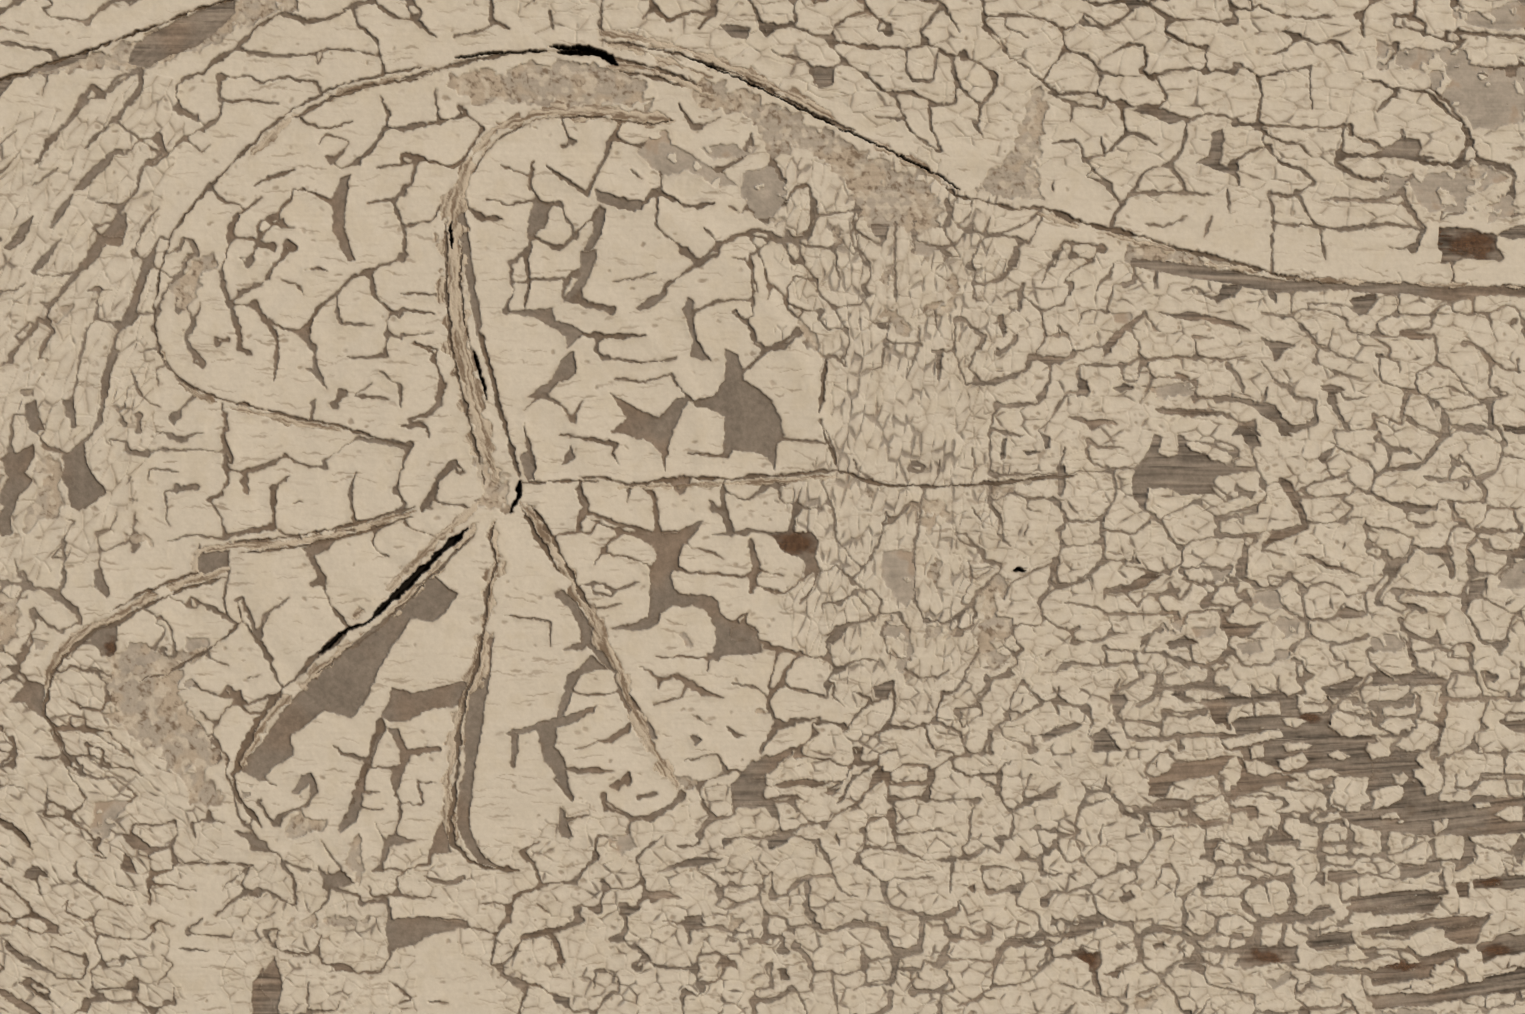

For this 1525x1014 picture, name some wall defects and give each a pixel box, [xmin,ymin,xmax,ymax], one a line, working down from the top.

crack [735,0,999,153]
crack [1391,0,1525,86]
peeling [0,358,106,537]
crack [578,330,704,408]
peeling [610,298,785,496]
peeling [1132,435,1256,512]
crack [1076,323,1319,474]
peeling [1232,387,1296,448]
peeling [575,489,761,662]
peeling [242,576,467,887]
crack [333,717,395,819]
crack [0,856,177,1014]